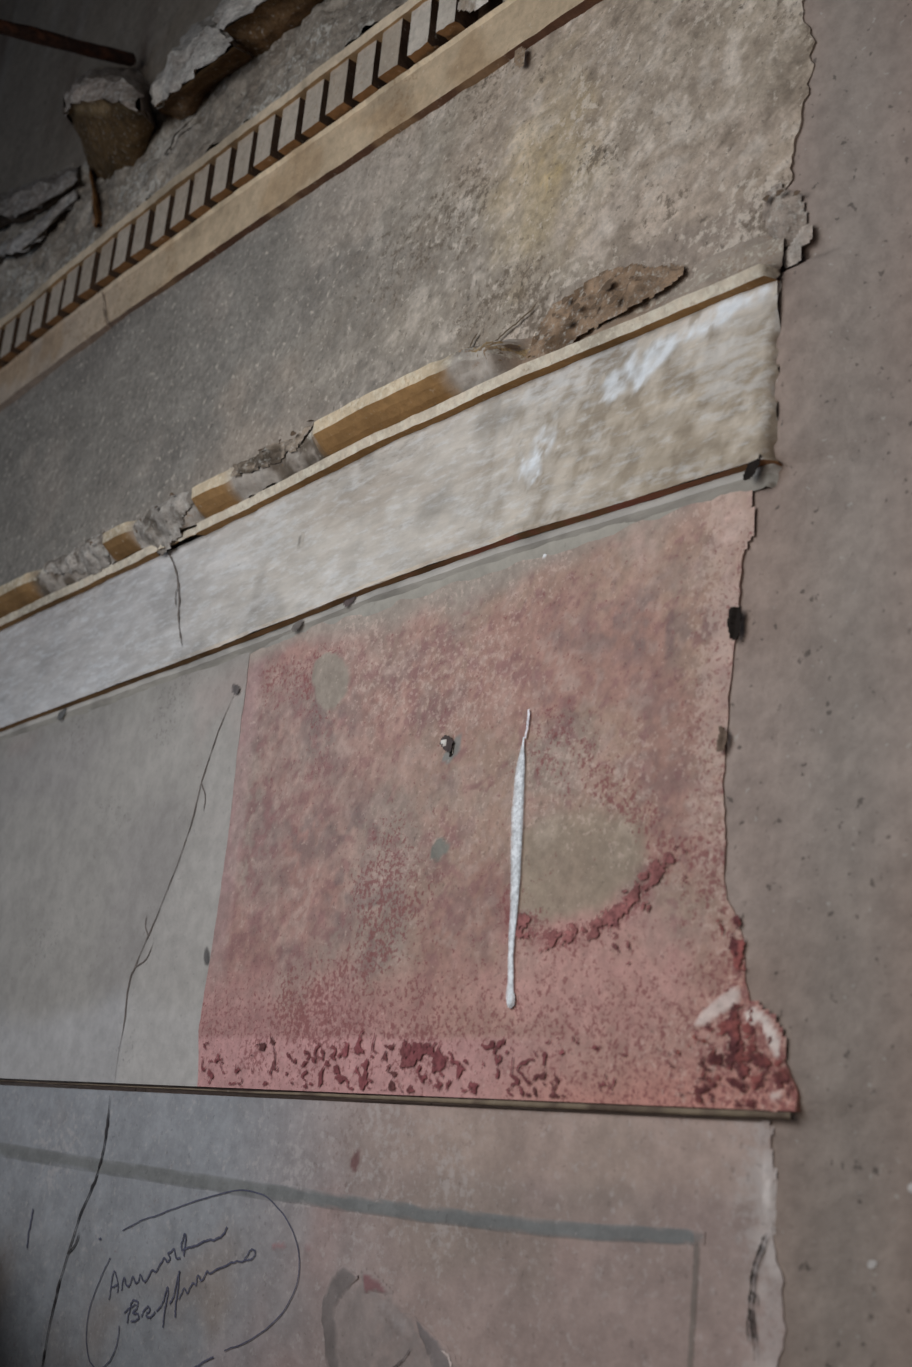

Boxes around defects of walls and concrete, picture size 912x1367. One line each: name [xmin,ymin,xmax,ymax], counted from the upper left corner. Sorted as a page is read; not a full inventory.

flaking render [459,263,685,361]
crack [167,552,182,645]
crack [42,695,234,1365]
peeling [201,1030,601,1098]
crack [746,1234,766,1361]